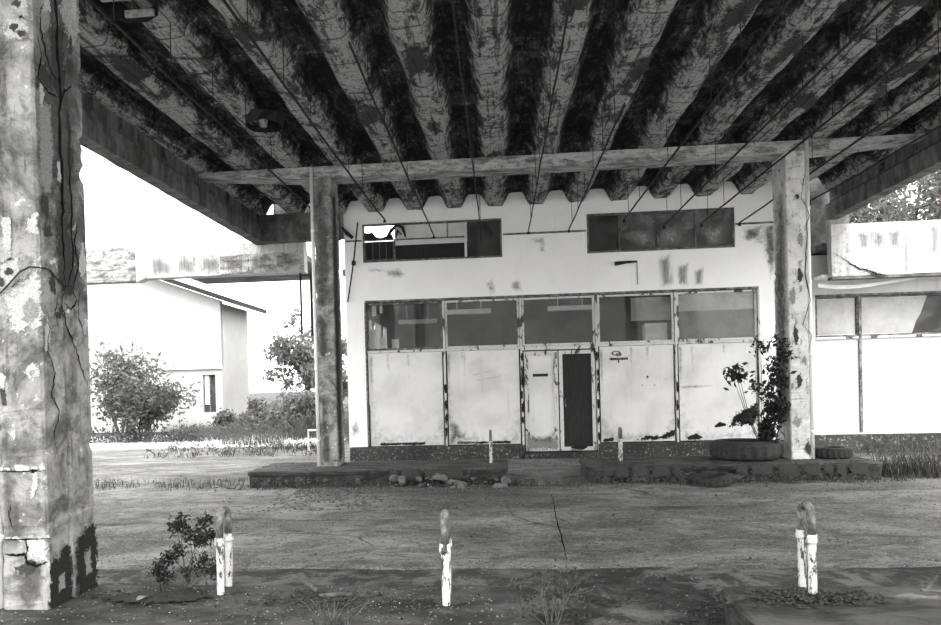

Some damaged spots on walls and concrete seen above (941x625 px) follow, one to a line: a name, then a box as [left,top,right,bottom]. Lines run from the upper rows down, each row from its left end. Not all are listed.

spalling [1,0,82,76]
spalling [25,83,74,237]
peeling [0,217,65,351]
crack [32,0,88,454]
spalling [78,243,88,279]
crack [836,254,888,278]
peeling [24,535,50,564]
crack [551,495,573,560]